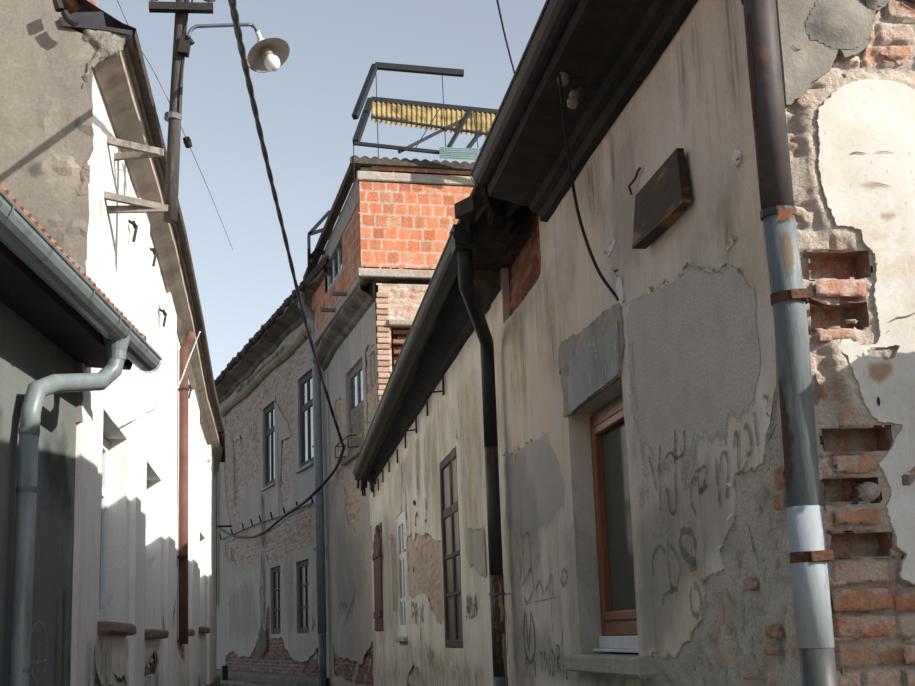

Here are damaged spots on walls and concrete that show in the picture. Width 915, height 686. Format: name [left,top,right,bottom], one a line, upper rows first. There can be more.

spalling [83,29,123,87]
corrosion [745,15,756,120]
corrosion [778,207,794,221]
flaking render [785,0,915,686]
damp [45,445,69,497]
flaking render [388,531,444,625]
flaking render [635,386,802,686]
flaking render [226,607,319,676]
flaking render [334,643,374,686]
corrosion [493,573,508,686]